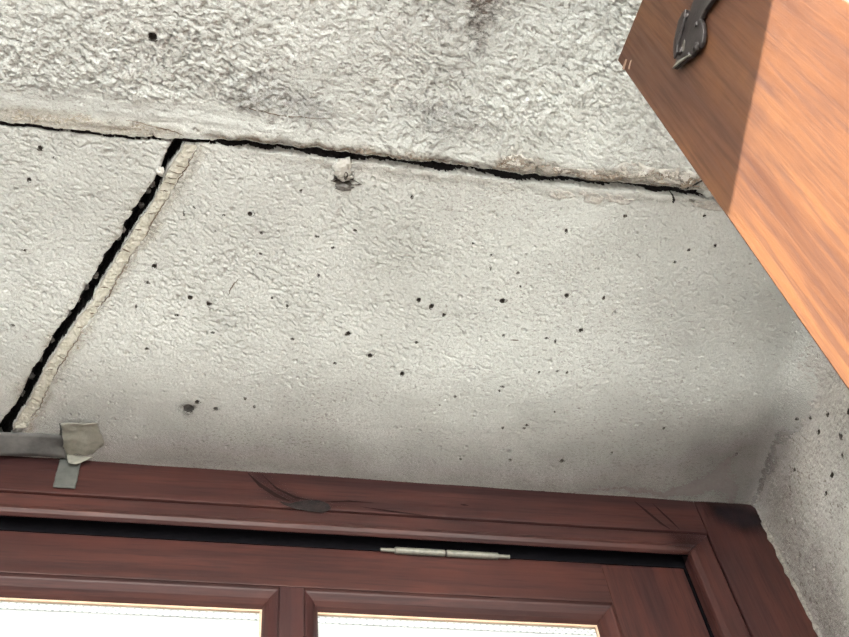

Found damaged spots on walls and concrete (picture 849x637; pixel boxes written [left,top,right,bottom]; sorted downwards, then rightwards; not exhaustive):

crack [240,106,327,119]
crack [0,120,703,432]